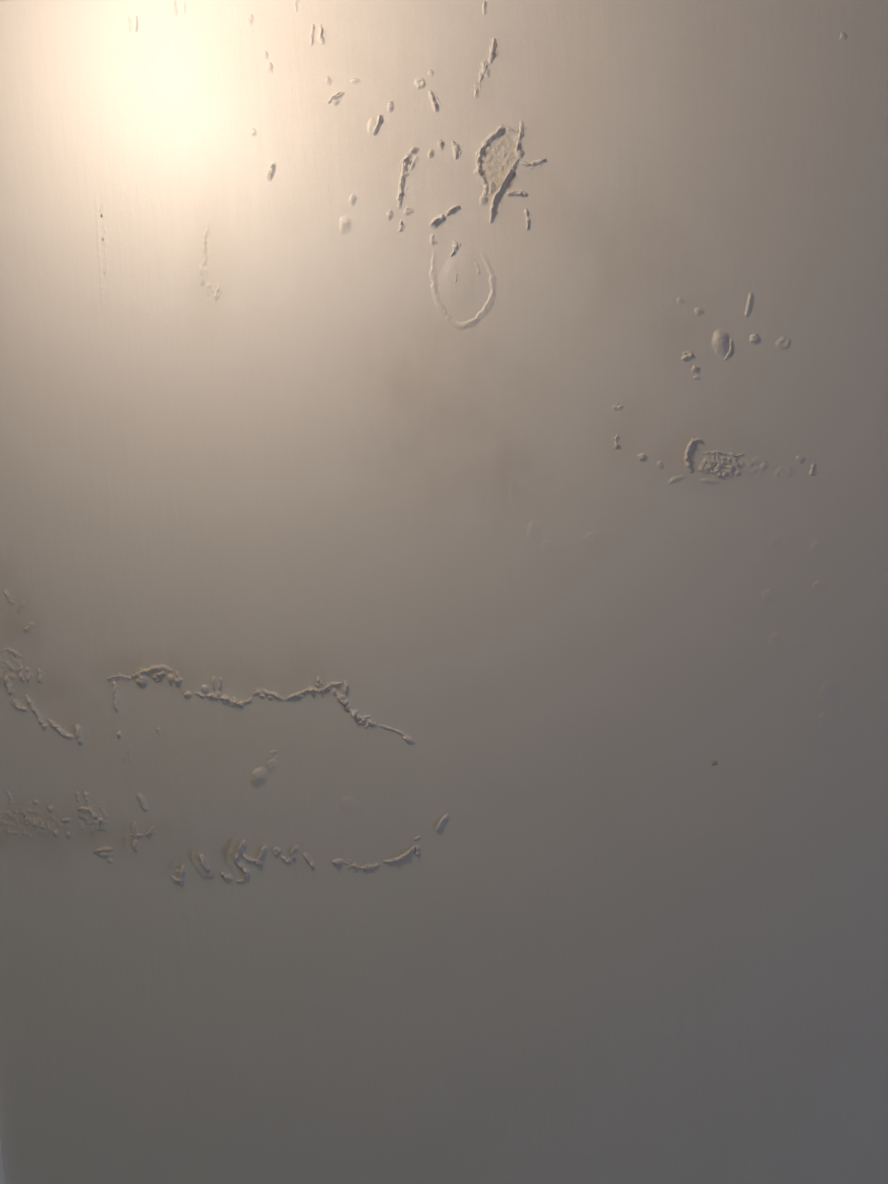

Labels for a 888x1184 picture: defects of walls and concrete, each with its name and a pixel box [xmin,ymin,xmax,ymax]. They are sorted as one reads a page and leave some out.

peeling [414,69,441,113]
peeling [386,121,548,232]